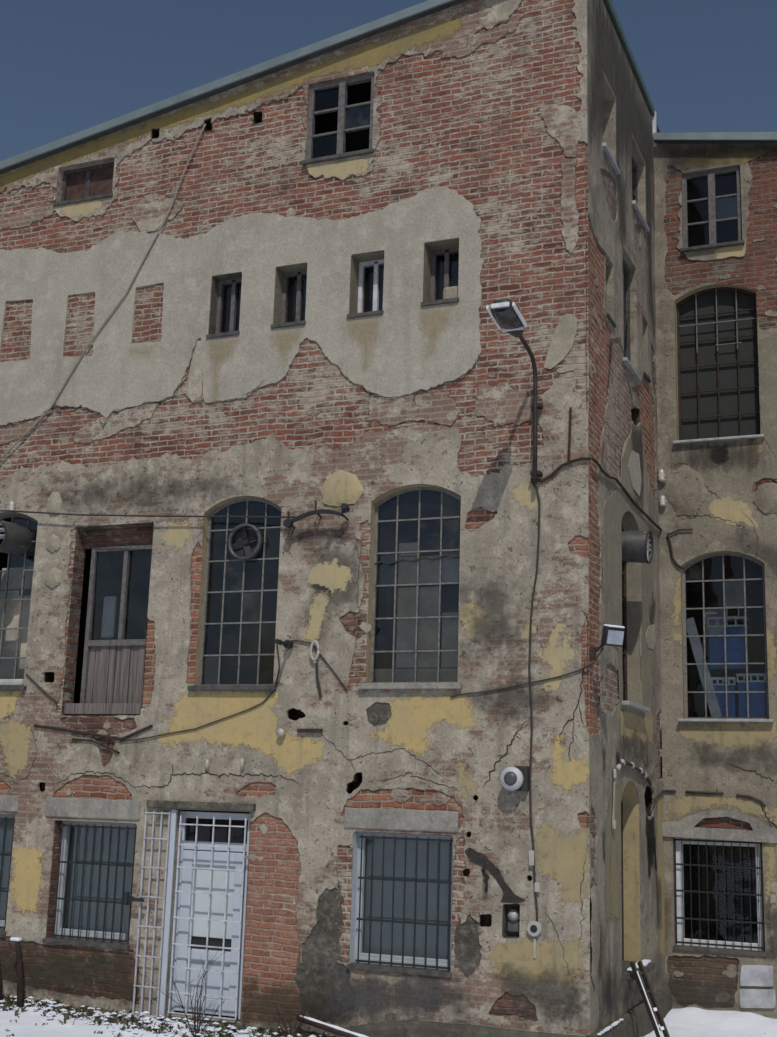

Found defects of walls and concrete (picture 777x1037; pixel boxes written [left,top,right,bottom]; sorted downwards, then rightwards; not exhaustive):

leakage [591,0,655,237]
flaking render [664,145,777,330]
flaking render [0,0,617,735]
peeling [0,691,35,795]
flaking render [39,527,156,800]
crack [54,764,300,790]
peeling [157,518,326,777]
peeling [366,691,478,758]
peeling [550,734,589,795]
crack [559,664,585,760]
peeling [10,842,44,917]
flaking render [241,812,355,1027]